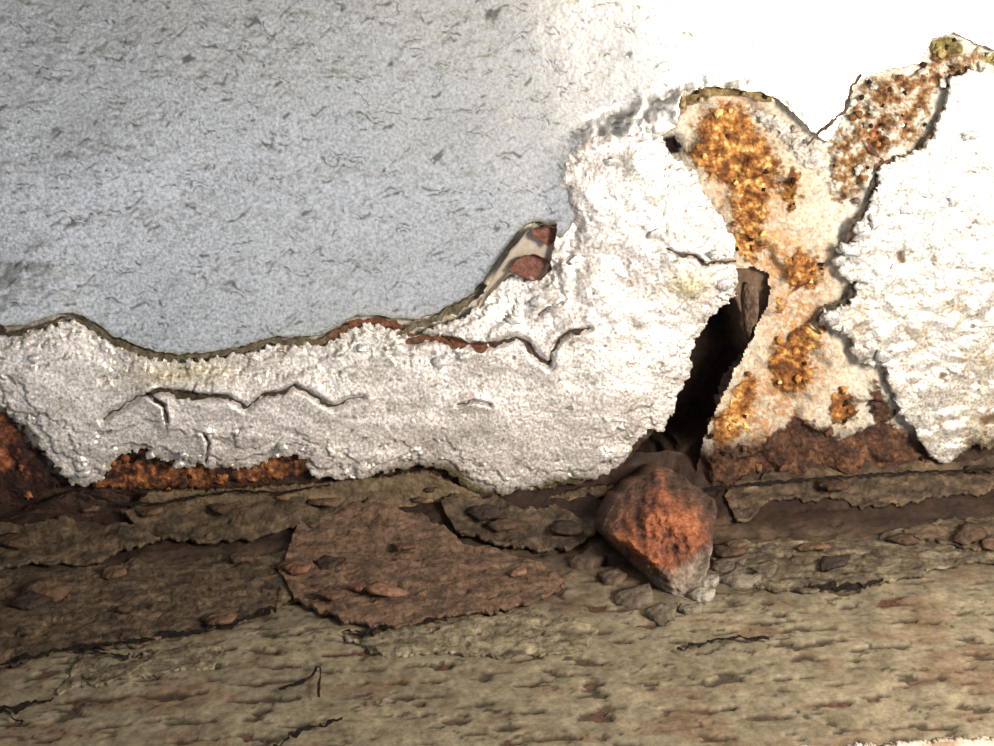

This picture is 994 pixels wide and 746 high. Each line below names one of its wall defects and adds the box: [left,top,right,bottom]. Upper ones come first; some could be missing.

peeling [580,102,621,121]
rust [678,87,805,264]
crack [667,248,737,266]
rust [775,247,825,313]
crack [0,283,589,365]
peeling [0,118,739,532]
rust [768,321,826,393]
rust [0,409,69,507]
rust [86,448,331,506]
crack [103,384,363,422]
rust [703,370,994,492]